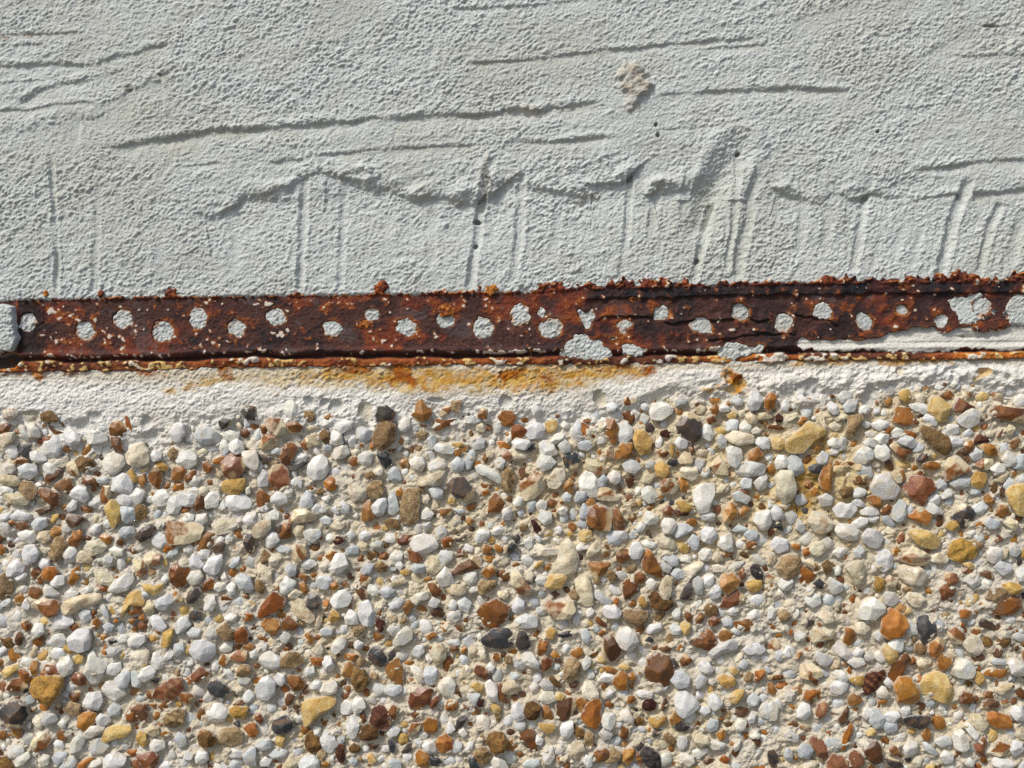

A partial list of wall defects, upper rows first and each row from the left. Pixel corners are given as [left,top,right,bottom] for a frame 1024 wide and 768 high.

rust [73,287,345,300]
rust [360,269,1024,366]
rust [166,367,232,393]
rust [324,334,656,391]
rust [717,342,765,393]